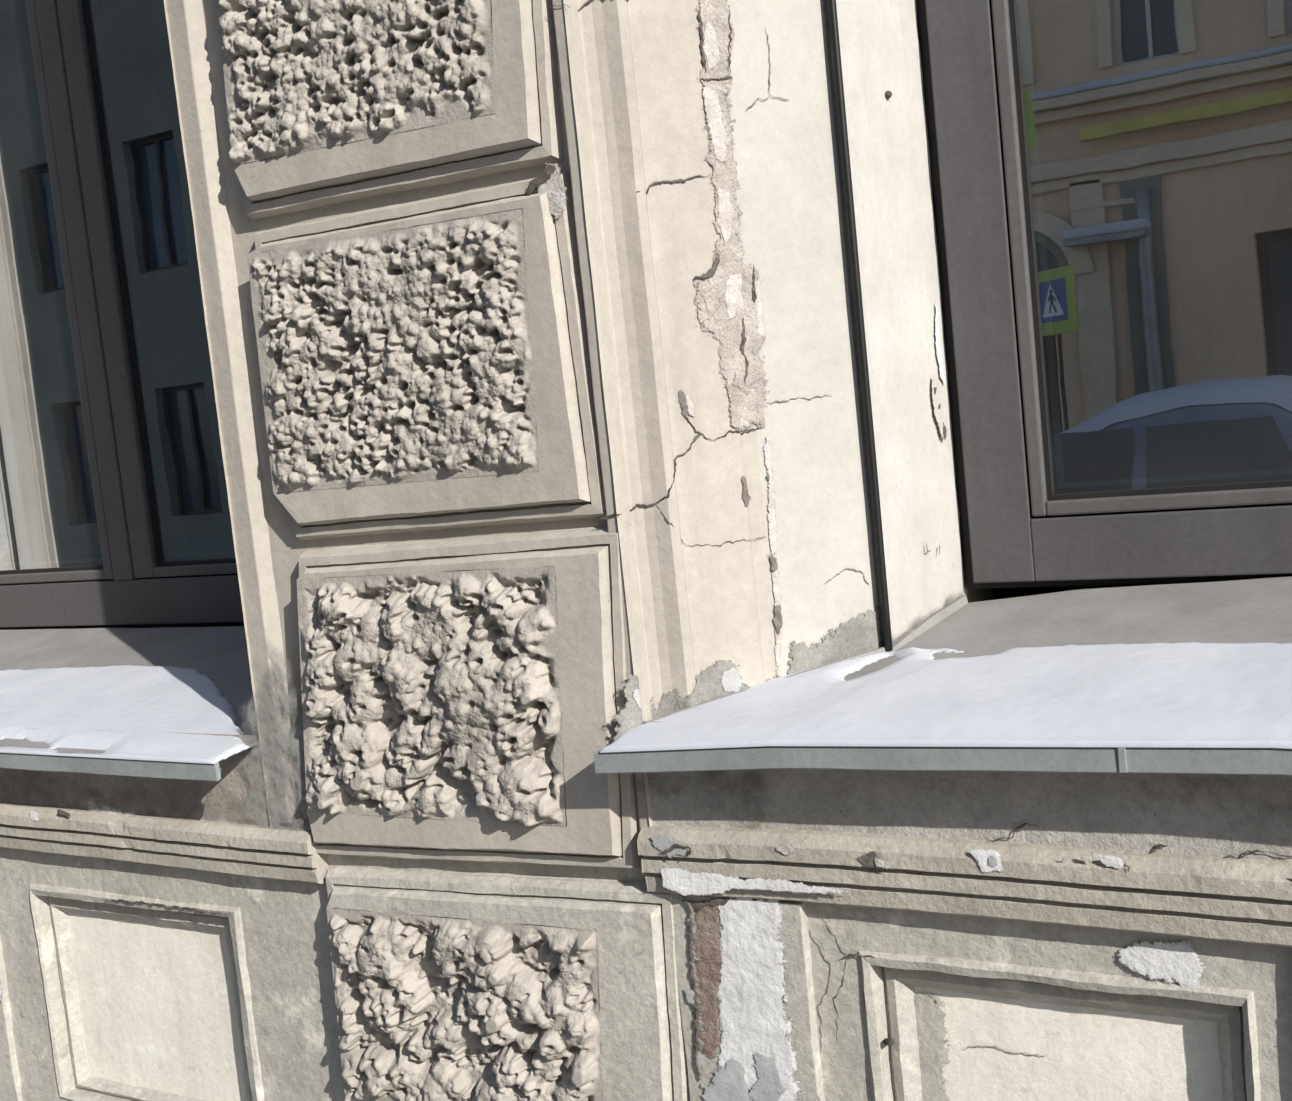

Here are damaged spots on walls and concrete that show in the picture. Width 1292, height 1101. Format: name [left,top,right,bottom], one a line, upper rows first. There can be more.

crack [550,0,592,10]
crack [746,27,790,110]
spalling [514,163,567,219]
crack [637,175,707,194]
peeling [693,0,783,674]
spalling [679,389,695,418]
crack [599,395,830,546]
crack [1224,849,1292,859]
peeling [651,835,851,1101]
crack [818,909,875,1041]
peeling [1117,940,1207,988]
peeling [914,992,952,1101]